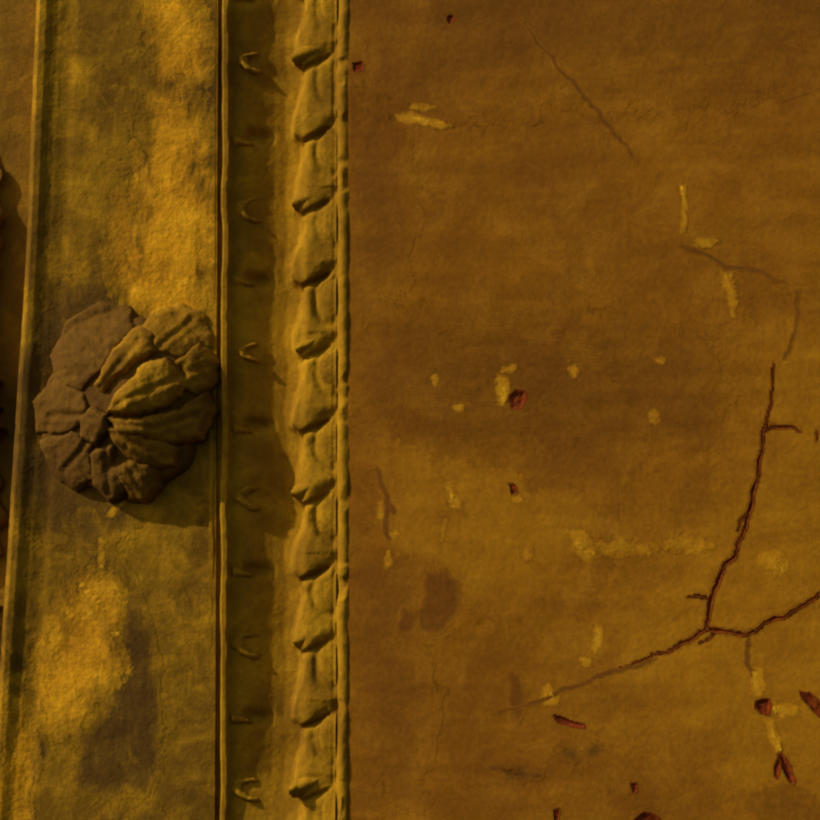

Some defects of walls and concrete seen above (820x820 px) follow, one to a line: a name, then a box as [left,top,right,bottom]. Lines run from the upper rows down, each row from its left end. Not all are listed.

peeling [394,102,456,130]
peeling [494,362,527,410]
leakage [349,0,820,820]
crack [491,244,820,715]
spalling [749,665,820,786]